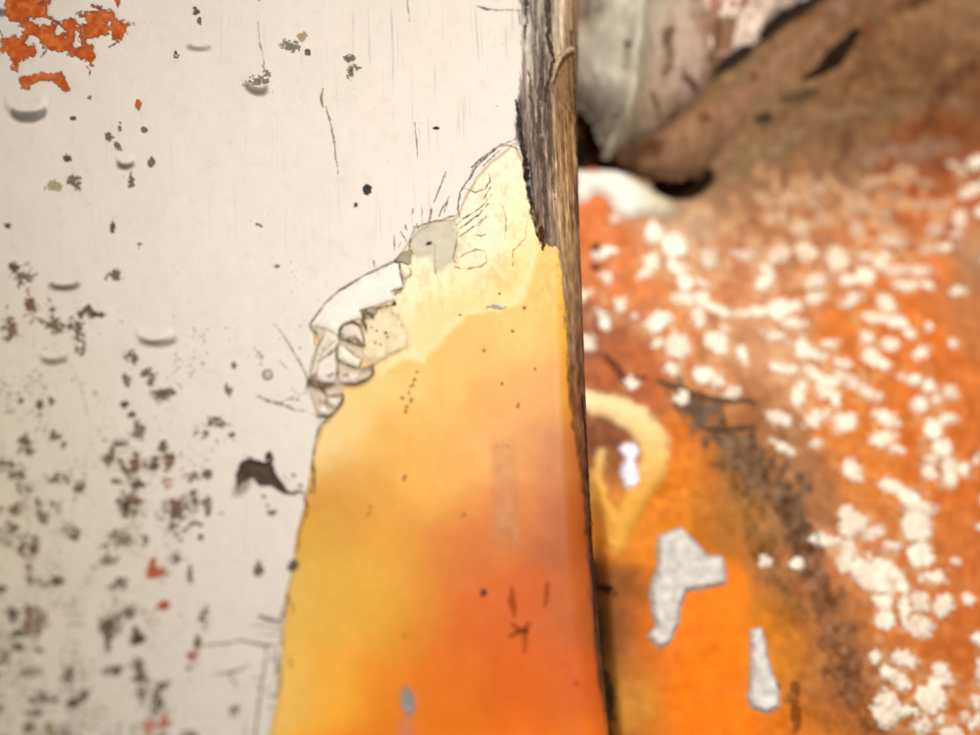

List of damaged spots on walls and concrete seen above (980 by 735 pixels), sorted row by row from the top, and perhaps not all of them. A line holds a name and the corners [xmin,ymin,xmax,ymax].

spalling [44,174,81,192]
spalling [1,261,107,356]
peeling [582,156,980,487]
spalling [122,345,176,405]
peeling [236,143,618,735]
spalling [98,401,213,584]
spalling [18,665,90,735]
spalling [97,605,147,653]
spalling [647,528,727,648]
spalling [747,627,780,713]
damp [674,397,861,696]
damp [778,682,802,734]